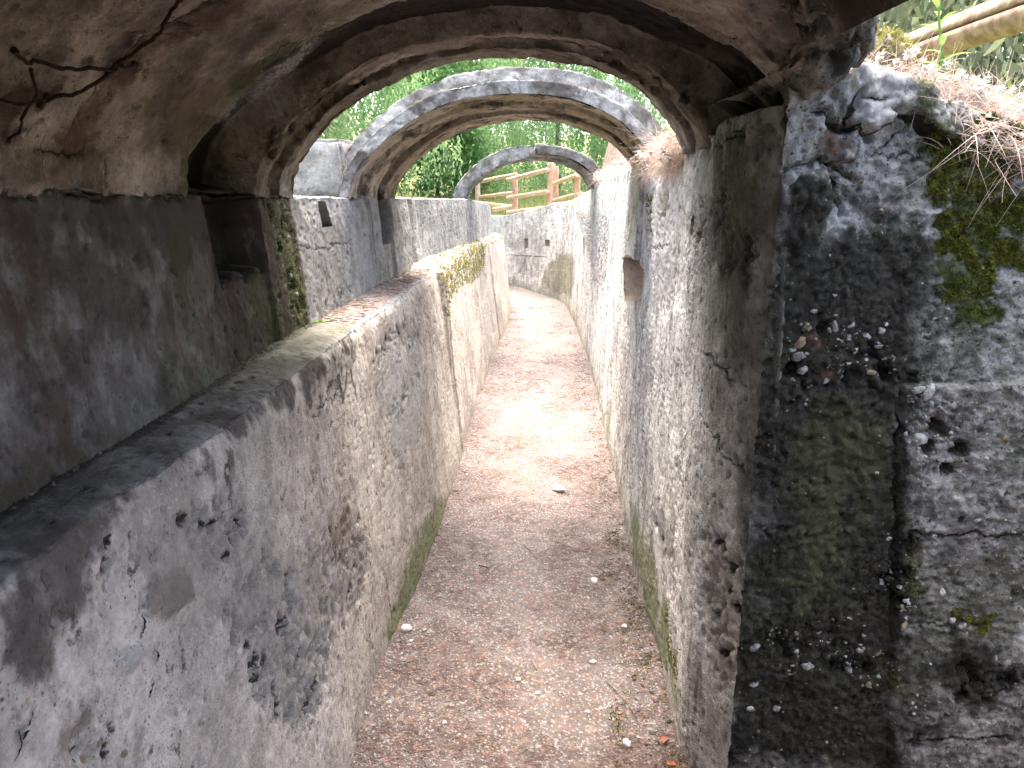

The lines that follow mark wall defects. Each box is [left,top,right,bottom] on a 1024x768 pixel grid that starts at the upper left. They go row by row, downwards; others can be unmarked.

leakage [713,122,772,378]
leakage [387,497,447,639]
leakage [630,502,678,709]
leakage [734,79,1024,768]
crack [886,390,1014,603]